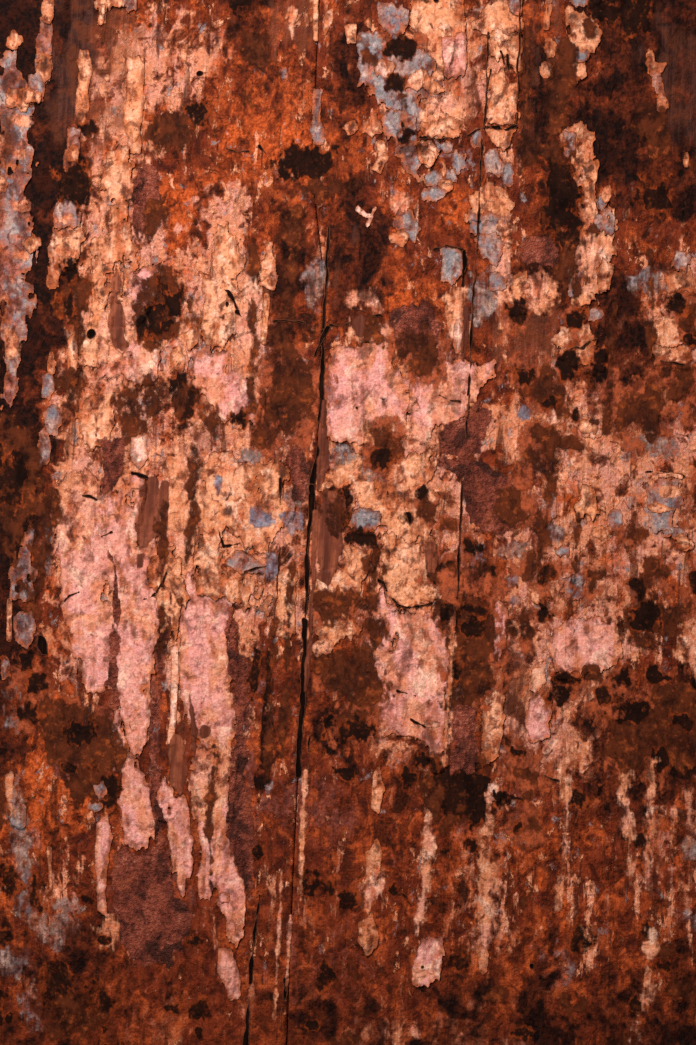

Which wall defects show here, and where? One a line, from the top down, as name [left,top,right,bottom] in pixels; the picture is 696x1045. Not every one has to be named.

peeling [565,0,602,84]
corrosion [131,264,202,352]
corrosion [106,369,249,446]
crack [218,530,241,548]
peeling [0,0,569,1020]
crack [244,227,382,778]
corrosion [308,549,395,782]
corrosion [400,476,696,715]
peeling [525,614,623,856]
peeling [550,121,618,370]
corrosion [496,37,696,487]
peeling [616,758,657,891]